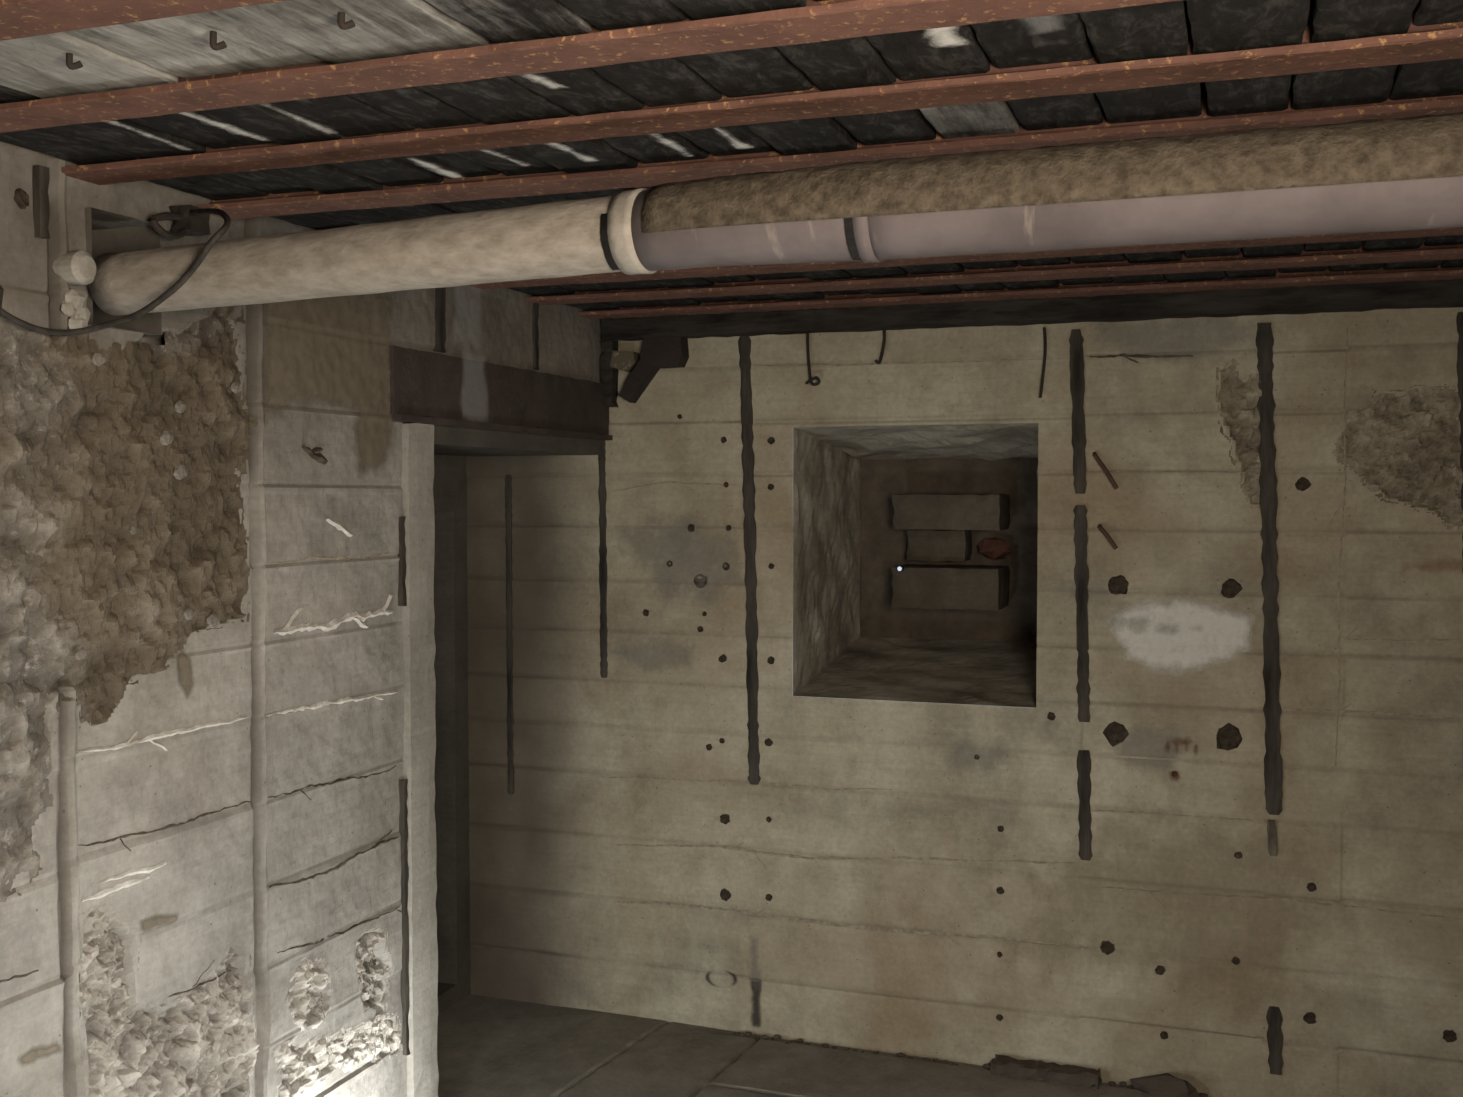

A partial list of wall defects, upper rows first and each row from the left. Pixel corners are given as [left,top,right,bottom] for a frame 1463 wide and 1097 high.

spalling [1216,359,1262,508]
spalling [1334,384,1463,531]
spalling [0,294,394,903]
spalling [20,1044,60,1064]
spalling [77,902,403,1097]